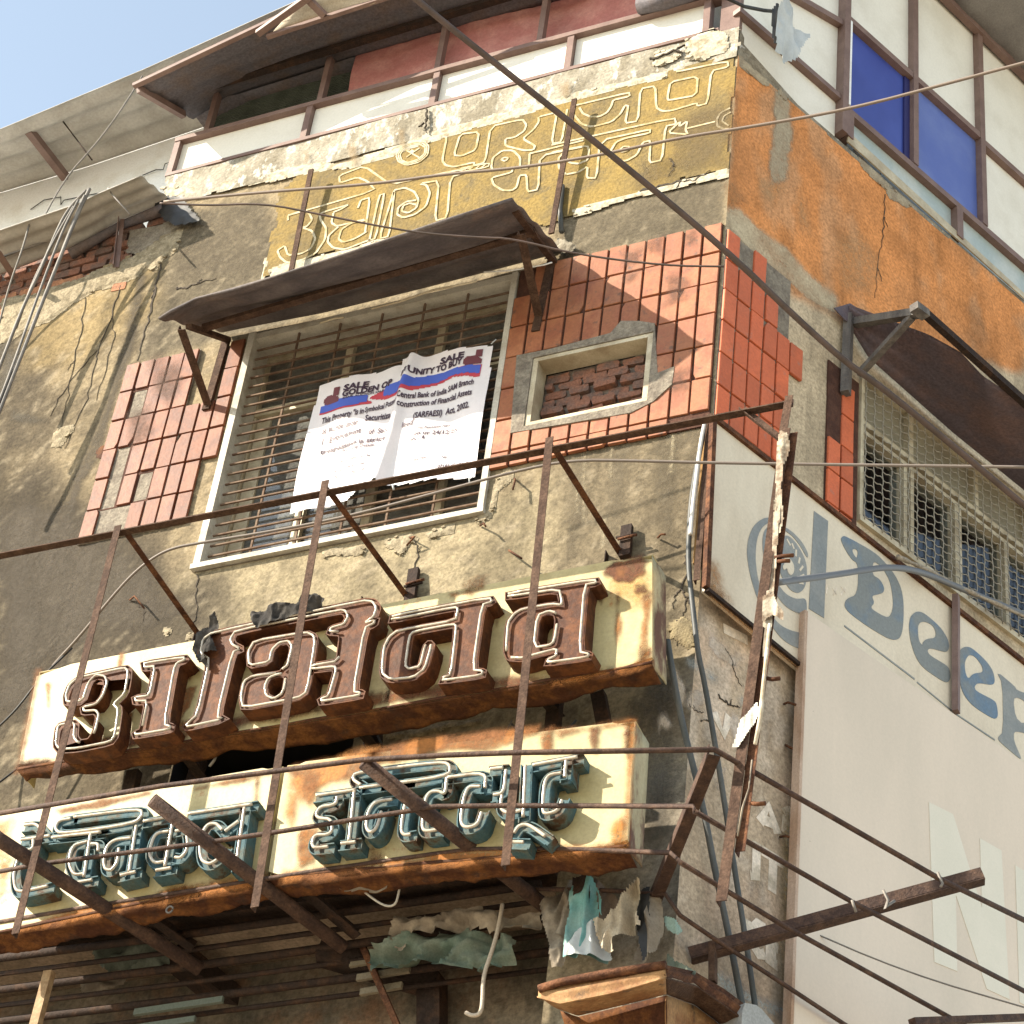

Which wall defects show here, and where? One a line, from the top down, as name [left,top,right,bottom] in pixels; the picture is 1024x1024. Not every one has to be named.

peeling [221,28,792,190]
peeling [160,186,196,197]
peeling [572,168,729,217]
crack [853,149,888,292]
flaking render [859,157,912,208]
flaking render [0,221,193,344]
peeling [261,238,387,279]
crack [50,285,121,449]
crack [689,648,742,722]